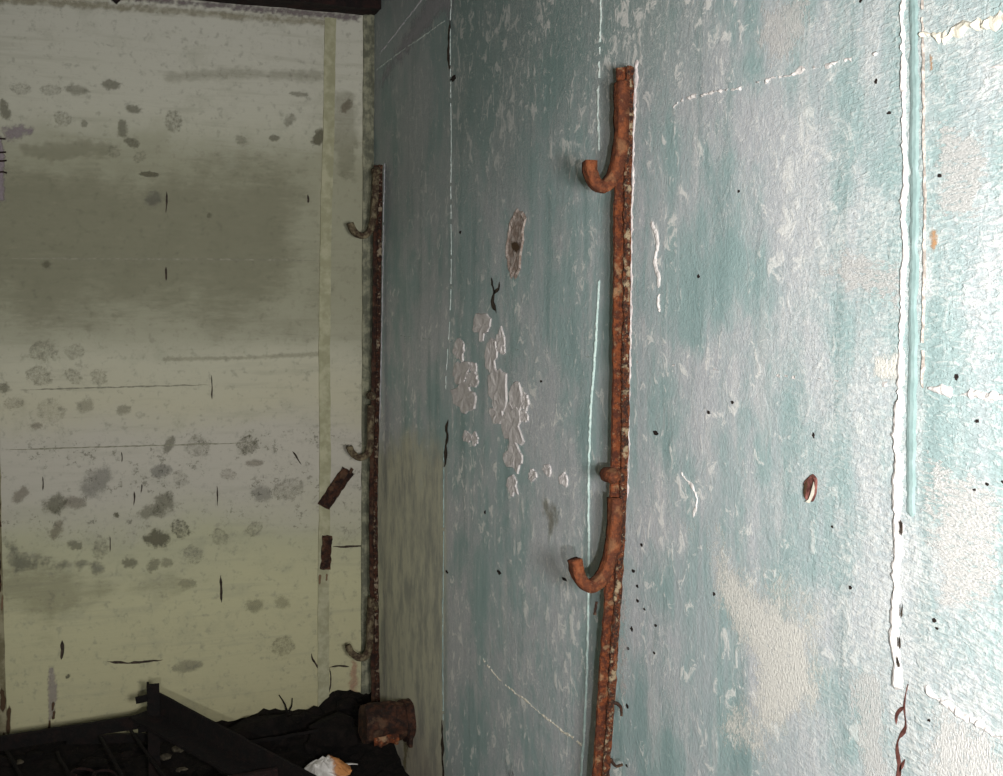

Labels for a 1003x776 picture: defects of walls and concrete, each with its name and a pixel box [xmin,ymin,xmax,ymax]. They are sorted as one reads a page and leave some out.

leakage [312,129,323,145]
spalling [506,208,527,279]
peeling [450,313,568,497]
leakage [143,520,189,547]
crack [895,604,909,776]